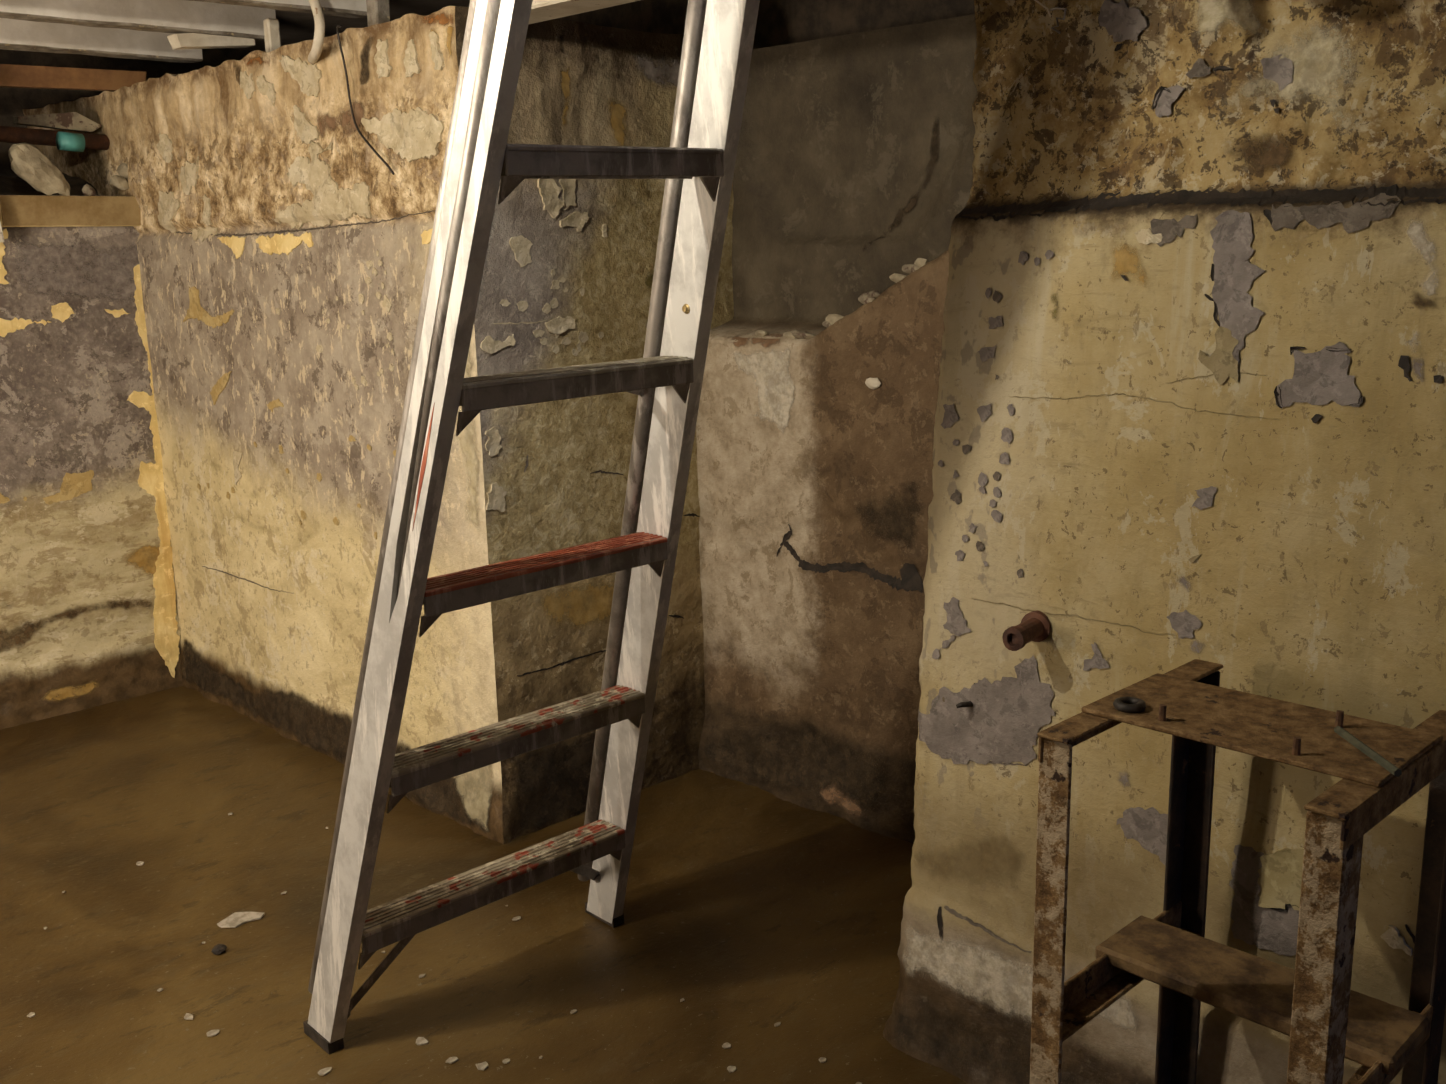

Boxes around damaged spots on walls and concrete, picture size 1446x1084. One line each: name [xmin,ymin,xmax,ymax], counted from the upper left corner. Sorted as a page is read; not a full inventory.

peeling [1152,58,1233,118]
peeling [0,229,9,284]
peeling [1134,193,1401,385]
peeling [0,302,74,337]
peeling [1274,342,1363,423]
peeling [0,470,94,505]
peeling [105,264,180,678]
crack [777,524,923,593]
damp [0,600,151,651]
peeling [1167,609,1202,653]
peeling [918,653,1055,766]